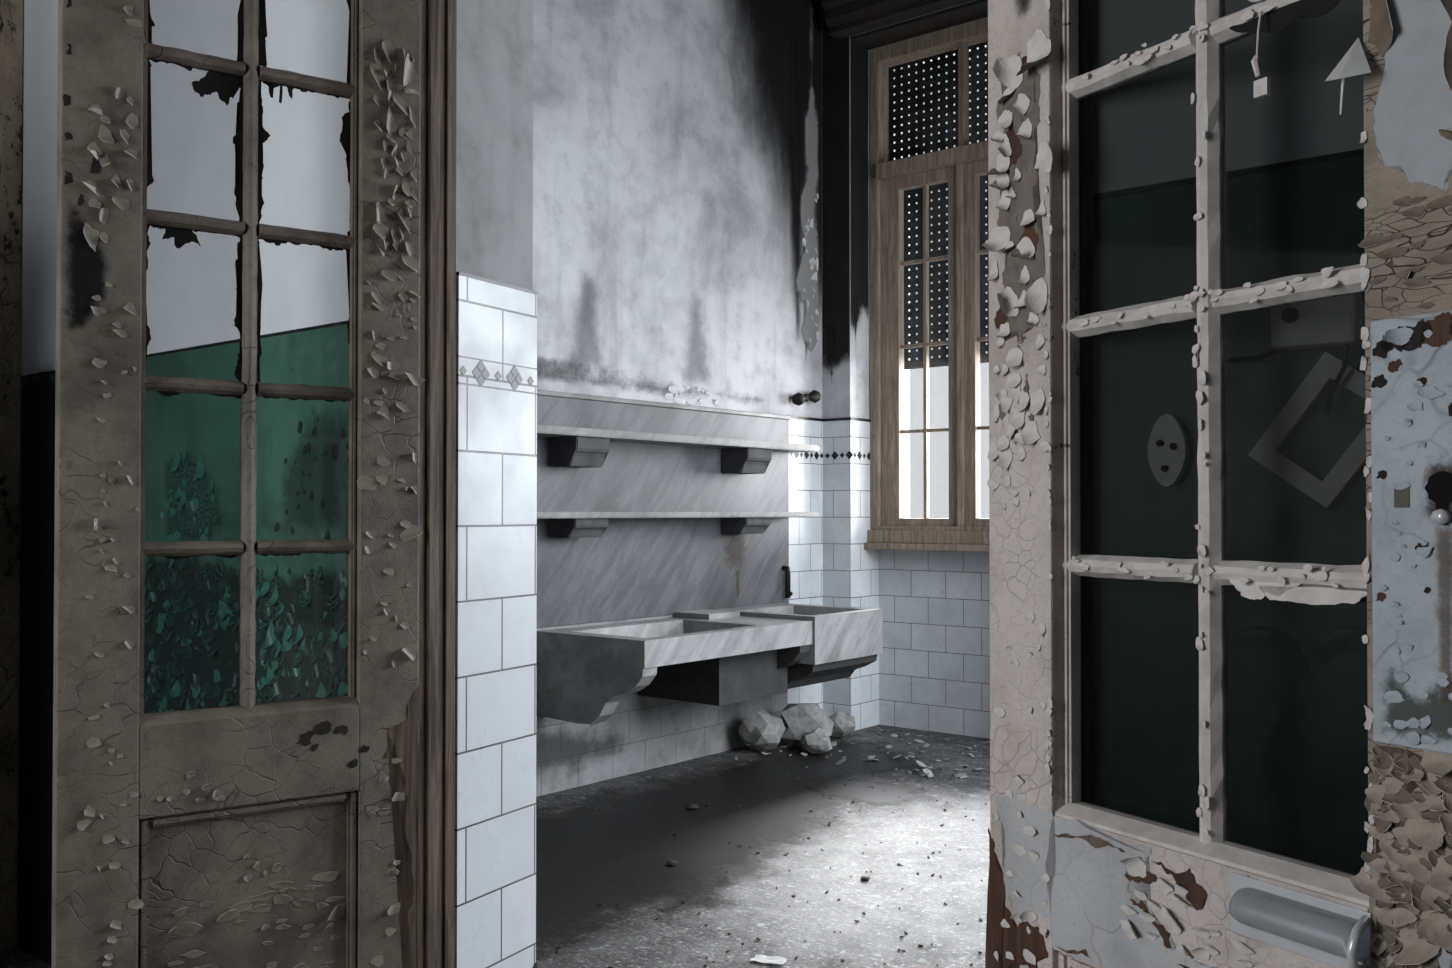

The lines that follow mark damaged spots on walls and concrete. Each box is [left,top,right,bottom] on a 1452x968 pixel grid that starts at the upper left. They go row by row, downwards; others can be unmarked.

peeling [1229,0,1340,34]
peeling [64,87,138,252]
peeling [363,40,426,419]
leakage [537,360,606,383]
leakage [791,6,869,376]
peeling [982,29,1053,530]
peeling [1168,286,1223,431]
peeling [1325,0,1452,302]
peeling [1360,302,1452,414]
peeling [1363,377,1452,521]
peeling [1110,524,1403,624]
peeling [985,697,1254,968]